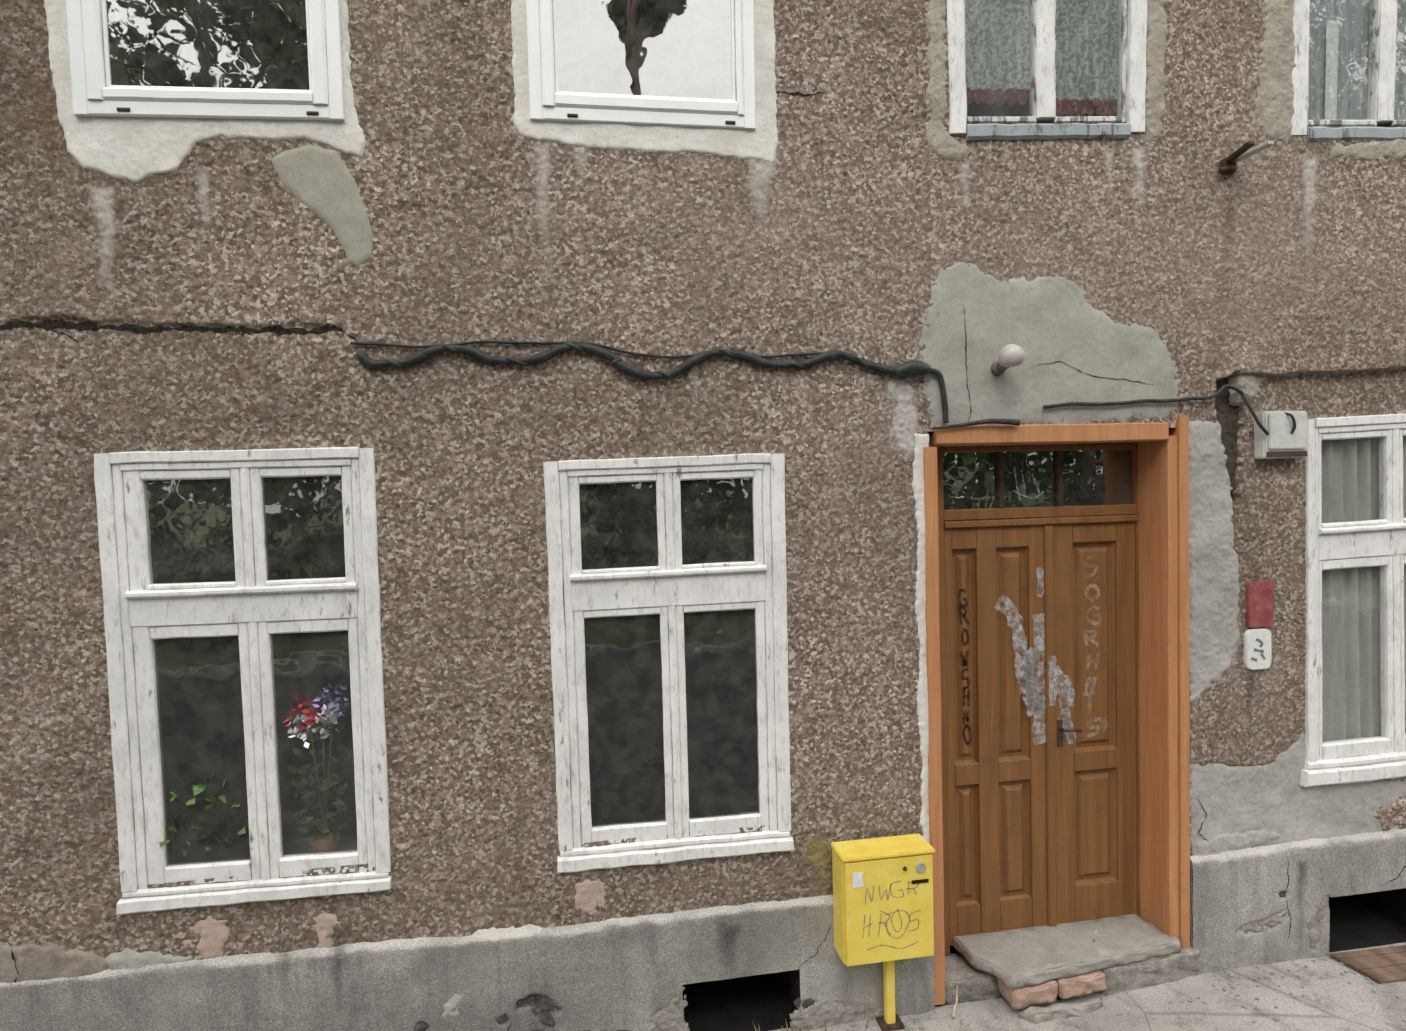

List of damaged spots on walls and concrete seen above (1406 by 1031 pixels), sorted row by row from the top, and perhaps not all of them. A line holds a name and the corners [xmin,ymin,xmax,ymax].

crack [0,320,357,343]
spalling [1190,733,1406,856]
spalling [1239,891,1287,934]
spalling [1307,896,1328,950]
spalling [414,991,466,1031]
spalling [495,995,559,1027]